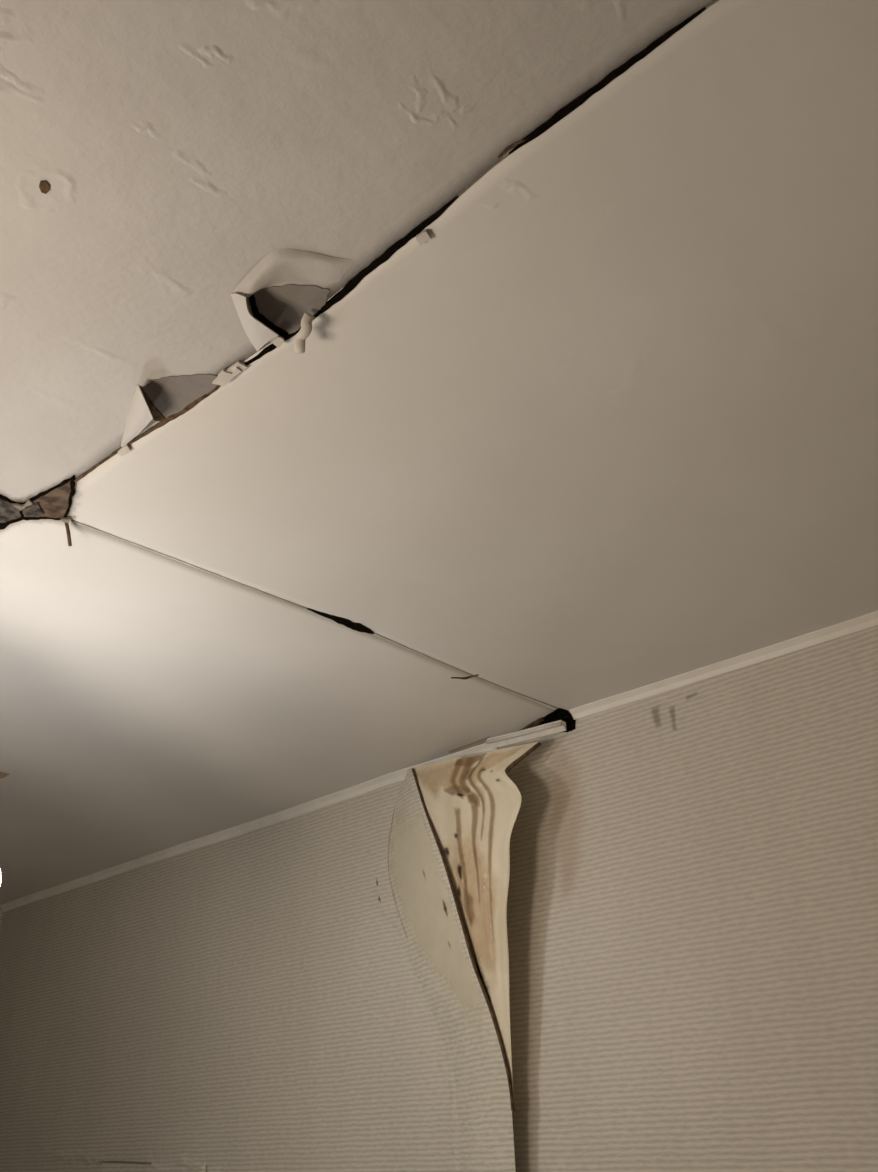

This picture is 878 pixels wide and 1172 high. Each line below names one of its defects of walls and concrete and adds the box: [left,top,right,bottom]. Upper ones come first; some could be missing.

crack [74,0,719,483]
peeling [231,249,356,353]
peeling [121,367,241,447]
spalling [0,475,75,546]
crack [71,519,558,709]